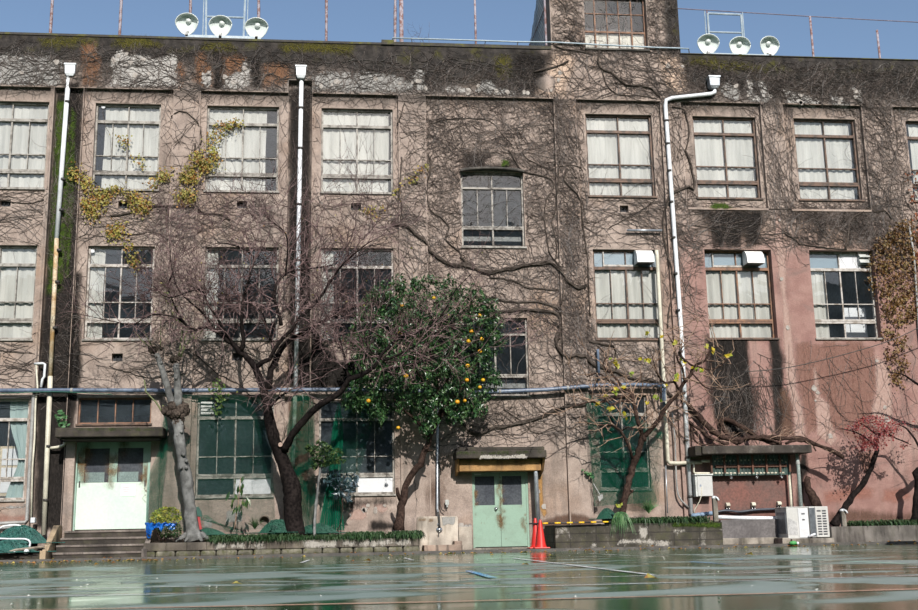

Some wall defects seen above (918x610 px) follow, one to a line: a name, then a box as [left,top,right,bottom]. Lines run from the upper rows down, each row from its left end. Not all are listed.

flaking render [110,50,182,88]
flaking render [223,62,251,89]
leakage [702,210,764,247]
leakage [706,339,757,437]